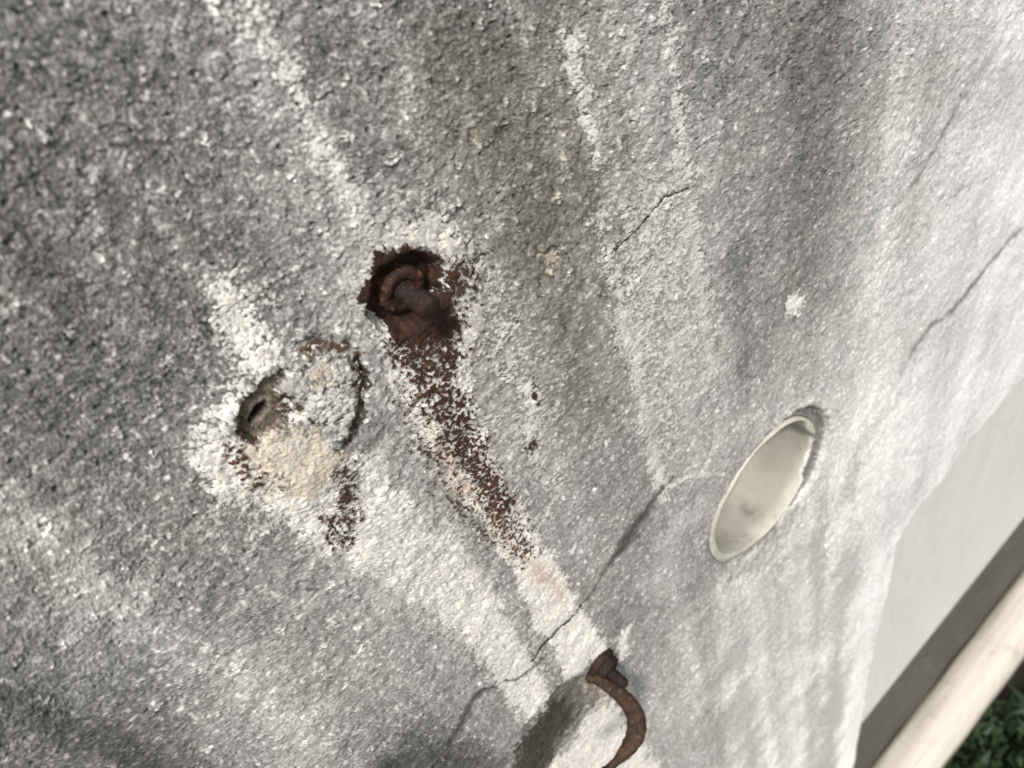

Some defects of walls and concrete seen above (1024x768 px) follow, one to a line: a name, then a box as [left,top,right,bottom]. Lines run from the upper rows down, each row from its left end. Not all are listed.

crack [605,186,694,257]
spalling [210,336,376,500]
rust [356,243,547,572]
rust [317,459,370,557]
crack [432,472,730,768]